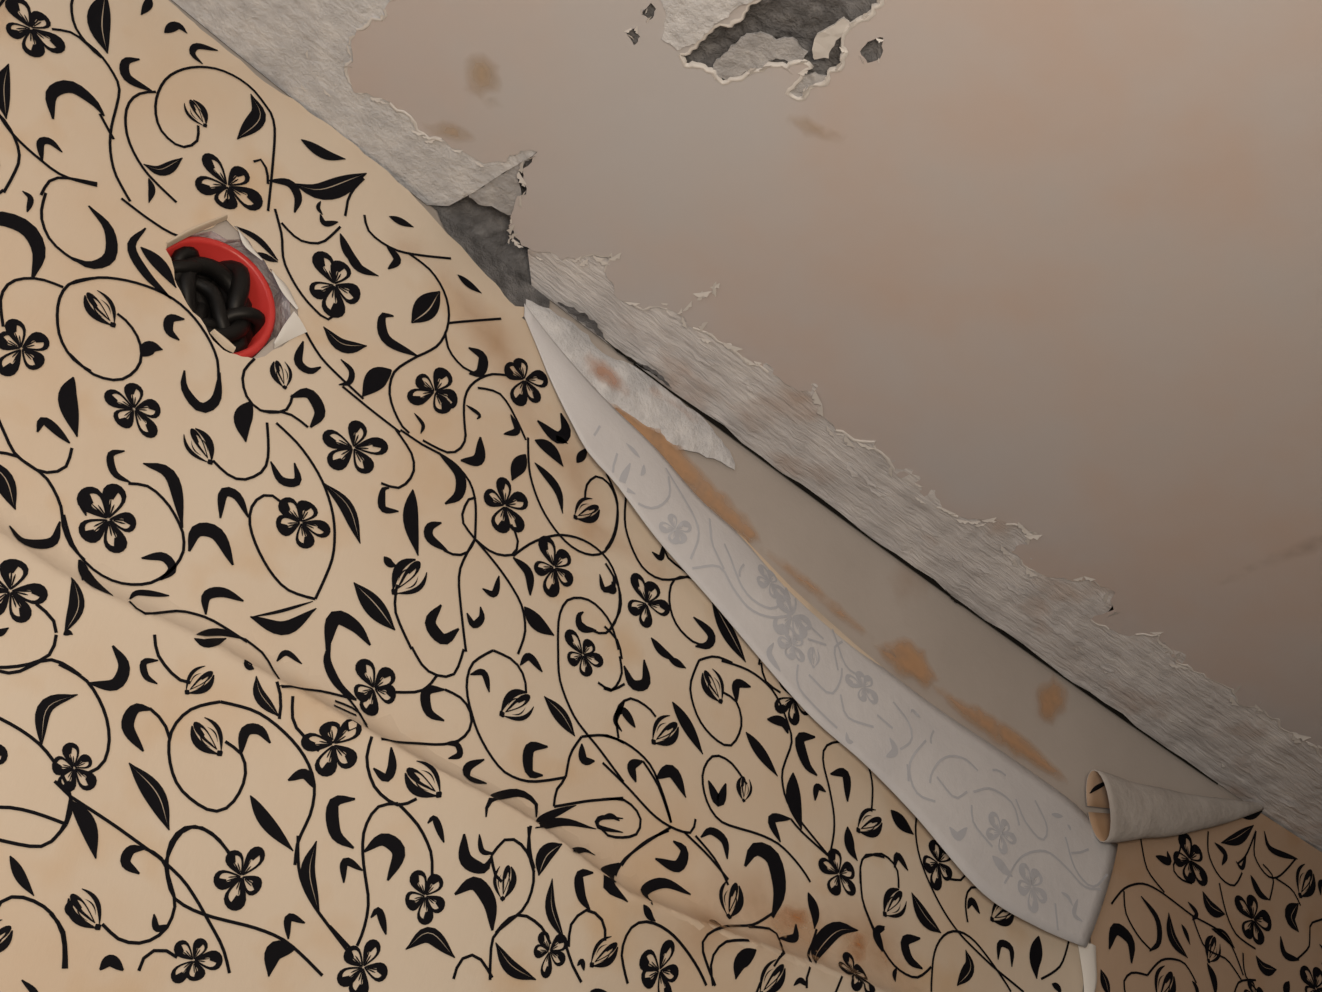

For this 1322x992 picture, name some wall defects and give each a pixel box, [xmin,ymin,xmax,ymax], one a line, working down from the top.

peeling [173,0,1322,852]